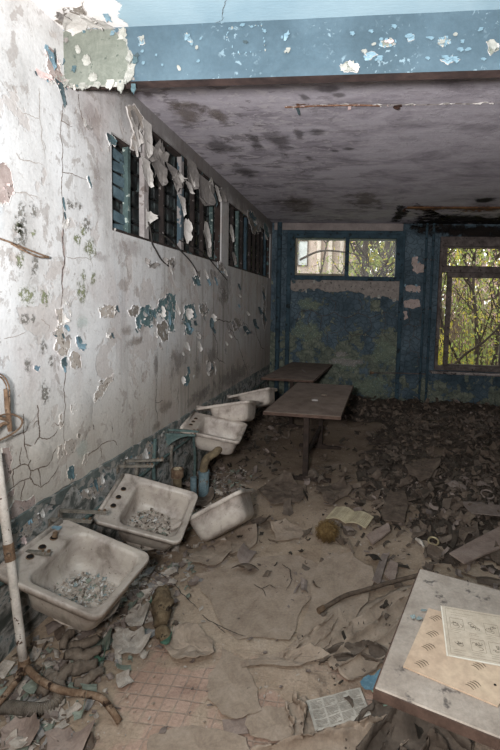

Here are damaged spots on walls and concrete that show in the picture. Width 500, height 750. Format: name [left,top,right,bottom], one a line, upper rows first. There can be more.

peeling [340,29,397,73]
peeling [426,32,471,65]
peeling [481,39,500,61]
peeling [35,0,227,244]
flaking render [0,161,15,207]
crack [16,92,93,305]
water stain [391,206,409,222]
peeling [191,221,228,286]
peeling [53,299,87,372]
peeling [98,293,217,356]
peeling [290,280,421,320]
crack [7,372,67,500]